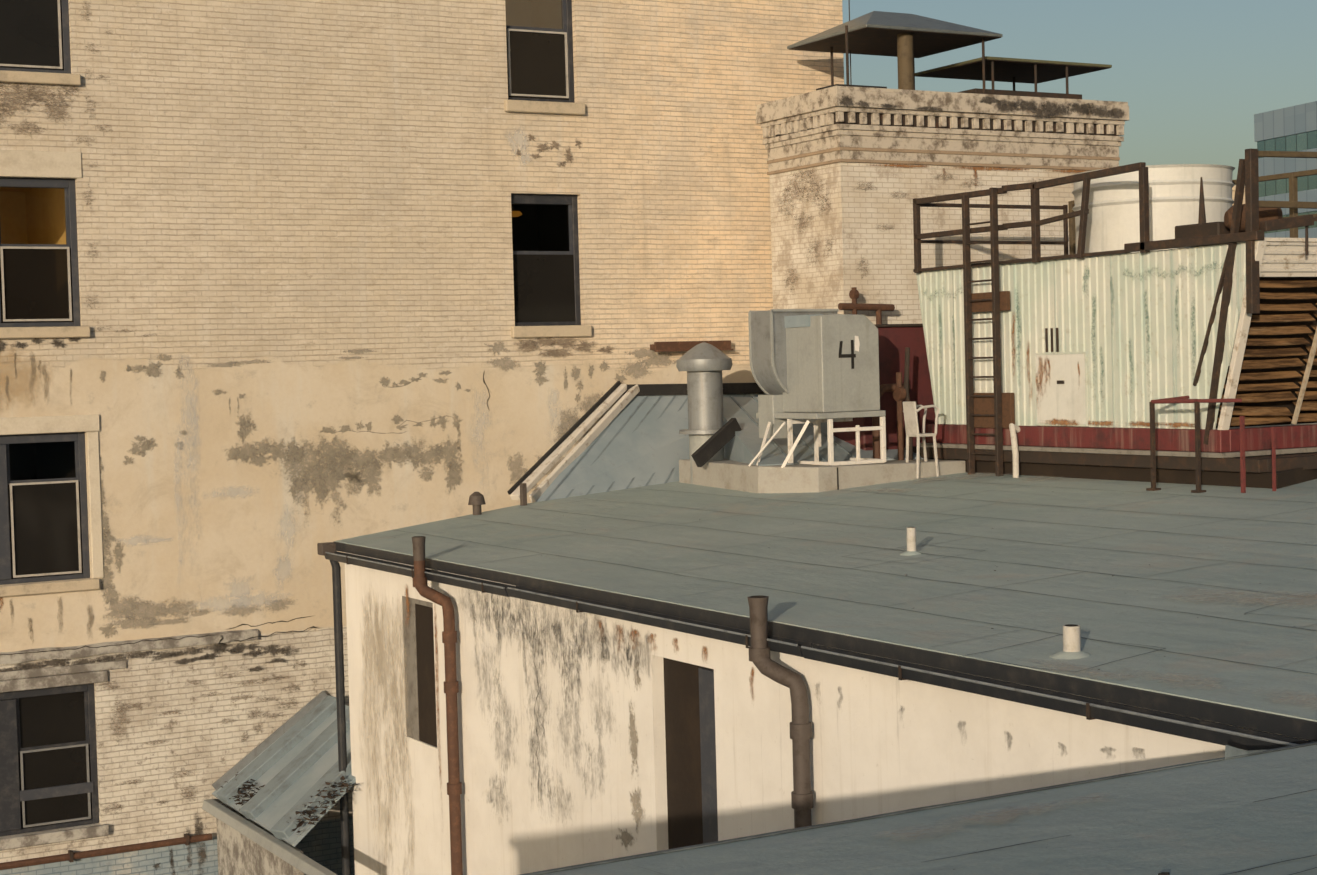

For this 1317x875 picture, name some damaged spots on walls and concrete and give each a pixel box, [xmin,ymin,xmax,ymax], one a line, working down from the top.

peeling [0,83,93,135]
peeling [517,135,581,166]
water stain [0,337,80,394]
peeling [215,389,461,499]
peeling [99,455,123,605]
spalling [0,643,305,741]